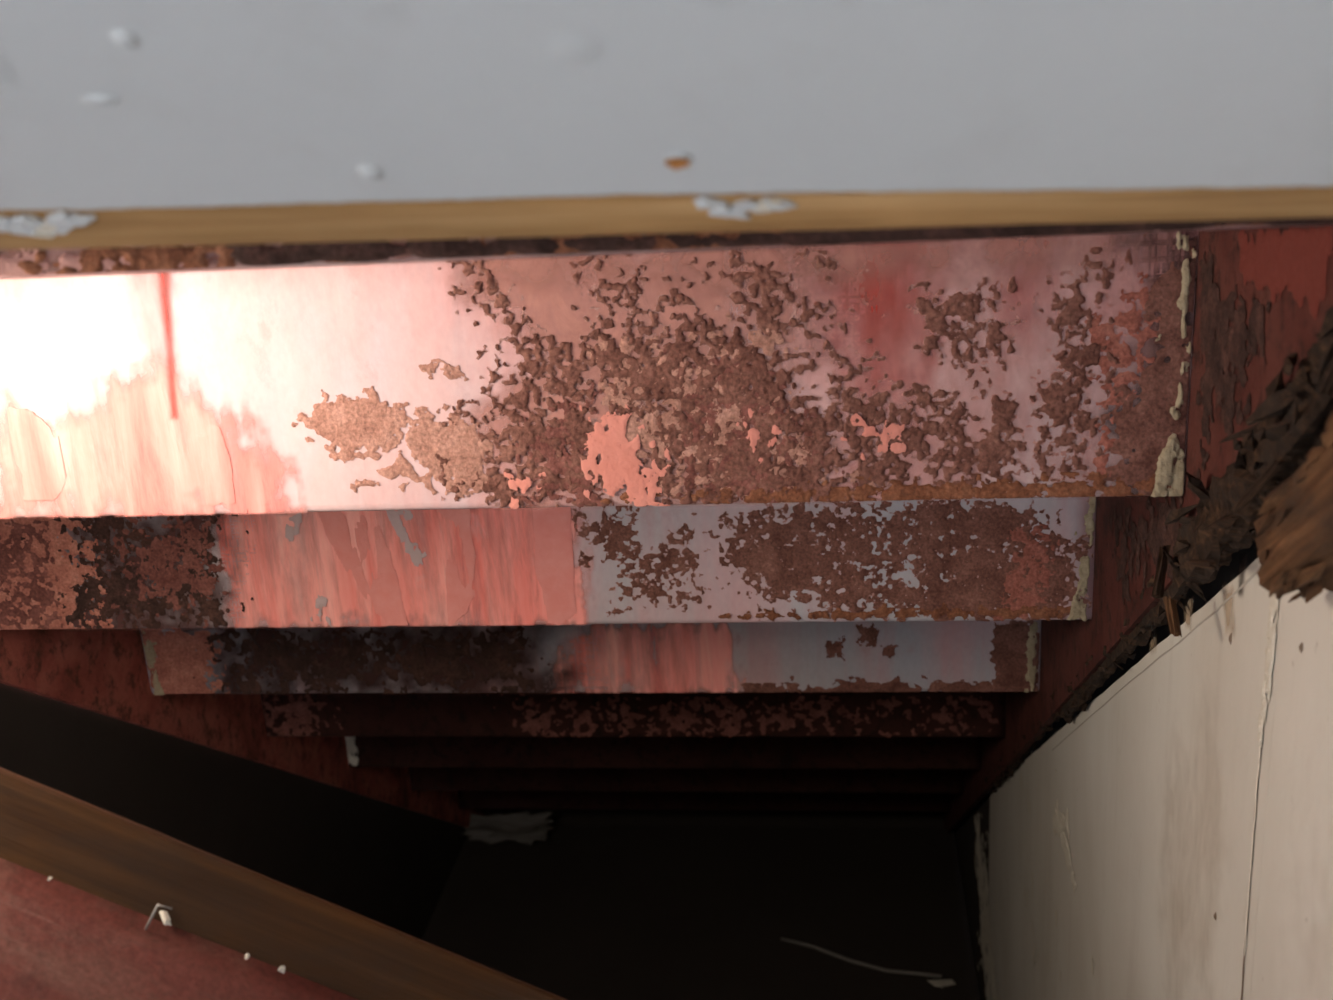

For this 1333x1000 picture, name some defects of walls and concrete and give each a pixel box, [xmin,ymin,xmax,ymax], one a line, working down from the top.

peeling [0,361,738,696]
corrosion [0,217,1333,738]
peeling [736,408,782,463]
peeling [840,413,906,460]
crack [1052,569,1279,1000]